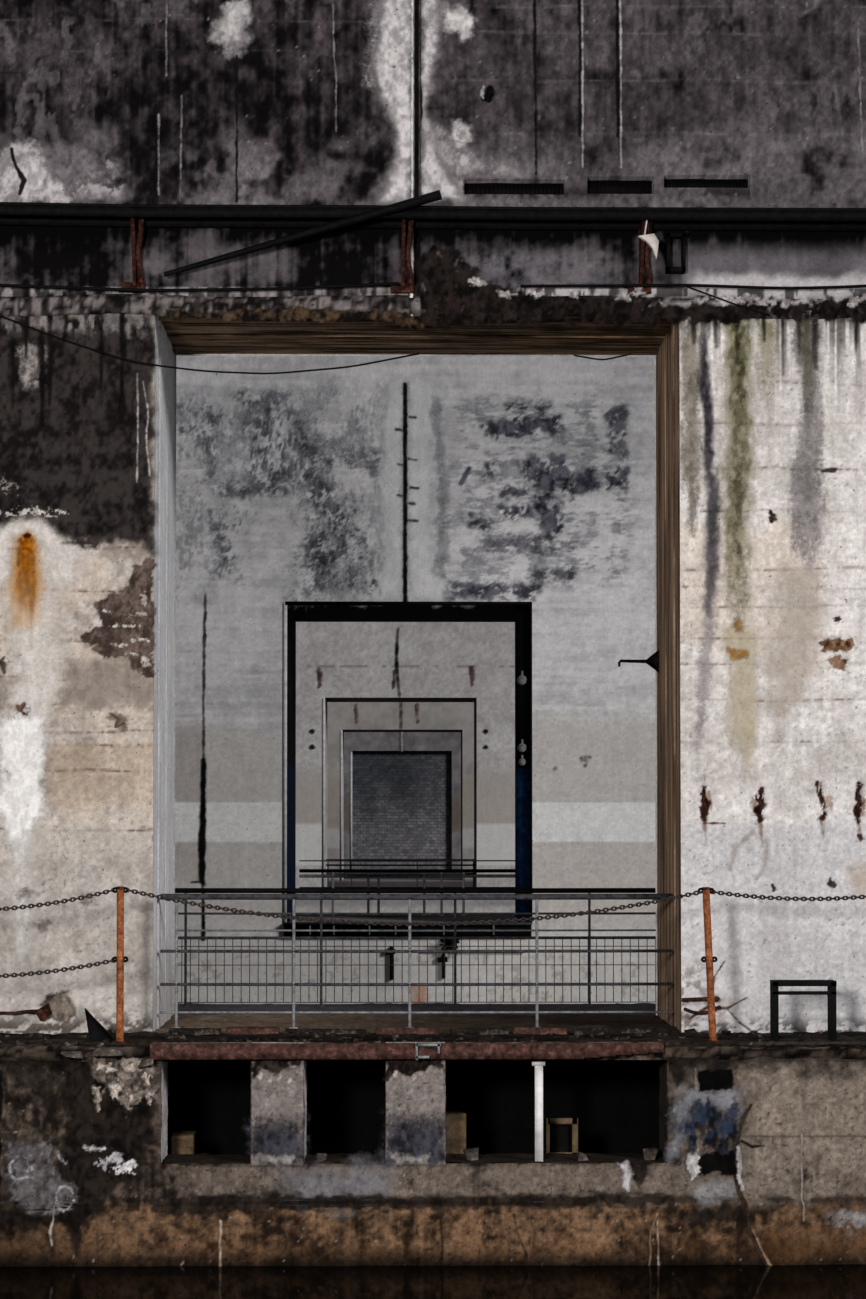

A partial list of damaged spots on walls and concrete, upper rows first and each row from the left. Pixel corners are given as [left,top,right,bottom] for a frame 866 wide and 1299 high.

leakage [211,0,251,57]
leakage [367,0,511,206]
leakage [0,141,123,203]
rust [13,533,40,622]
peeling [66,535,113,548]
leakage [678,319,826,760]
leakage [0,313,157,955]
peeling [60,558,157,731]
spalling [83,1056,162,1112]
leakage [668,1087,740,1157]
leakage [152,1114,672,1266]
spalling [686,1146,743,1191]